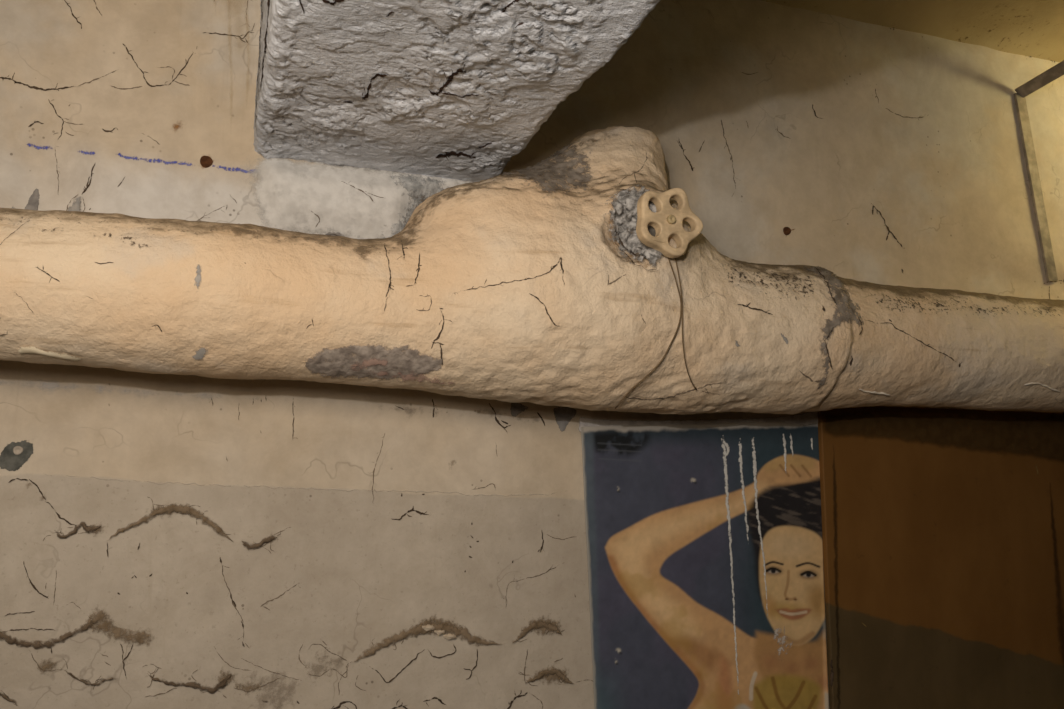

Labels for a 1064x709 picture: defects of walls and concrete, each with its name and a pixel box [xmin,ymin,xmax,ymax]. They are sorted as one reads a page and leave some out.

crack [0,0,270,210]
water stain [502,140,595,194]
spalling [0,440,33,471]
crack [215,557,366,709]
crack [392,697,446,709]
crack [507,691,543,709]